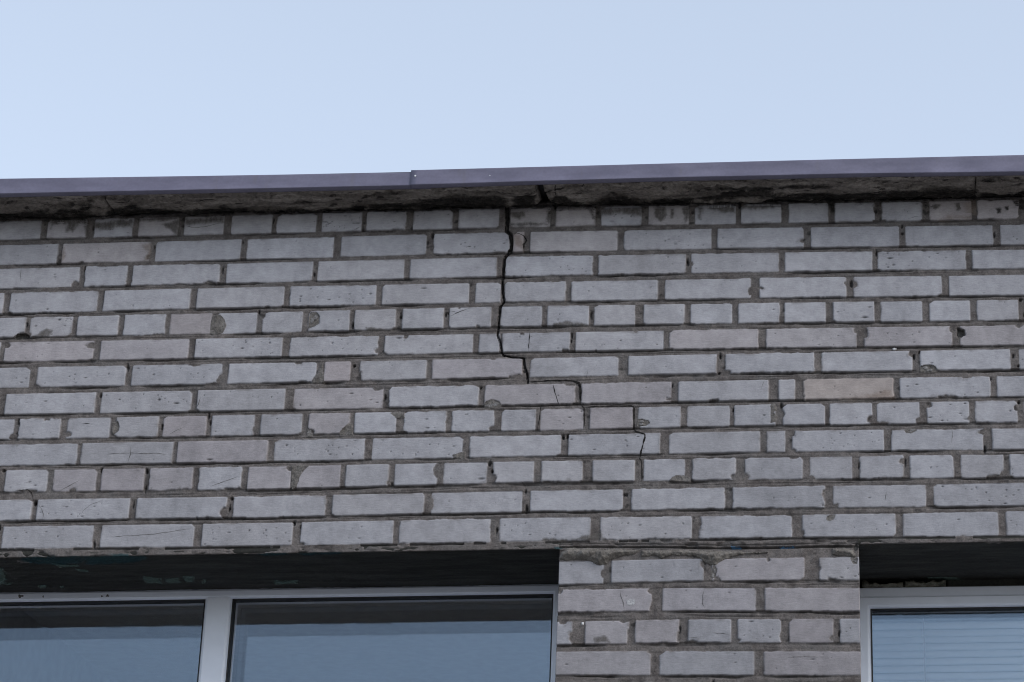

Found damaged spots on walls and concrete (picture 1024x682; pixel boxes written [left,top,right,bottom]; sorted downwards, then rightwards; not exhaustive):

damp [0,179,1024,237]
crack [497,207,646,478]